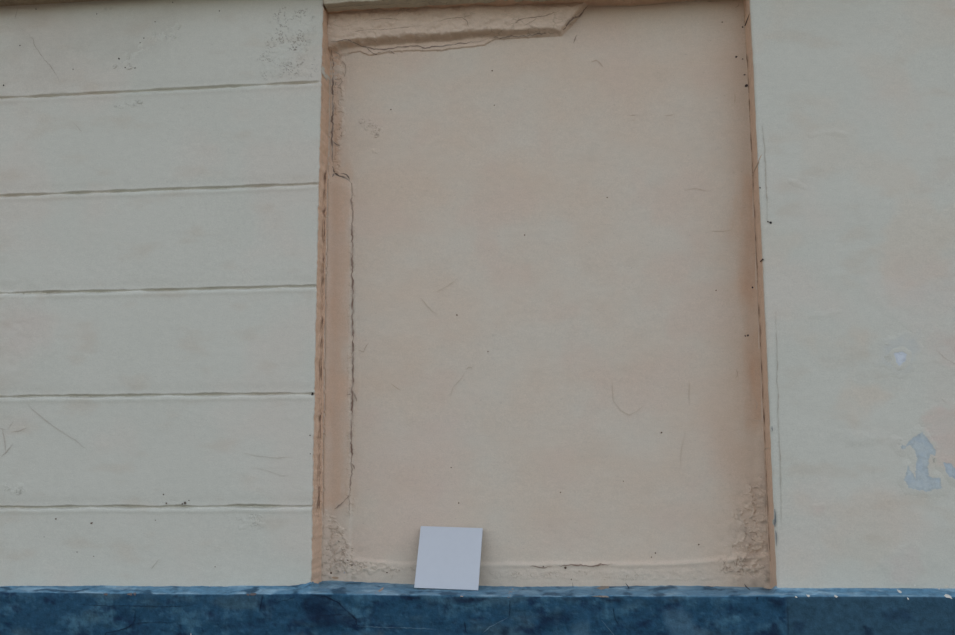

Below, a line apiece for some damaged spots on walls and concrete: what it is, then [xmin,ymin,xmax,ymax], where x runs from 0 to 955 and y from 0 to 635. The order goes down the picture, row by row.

crack [318,6,588,516]